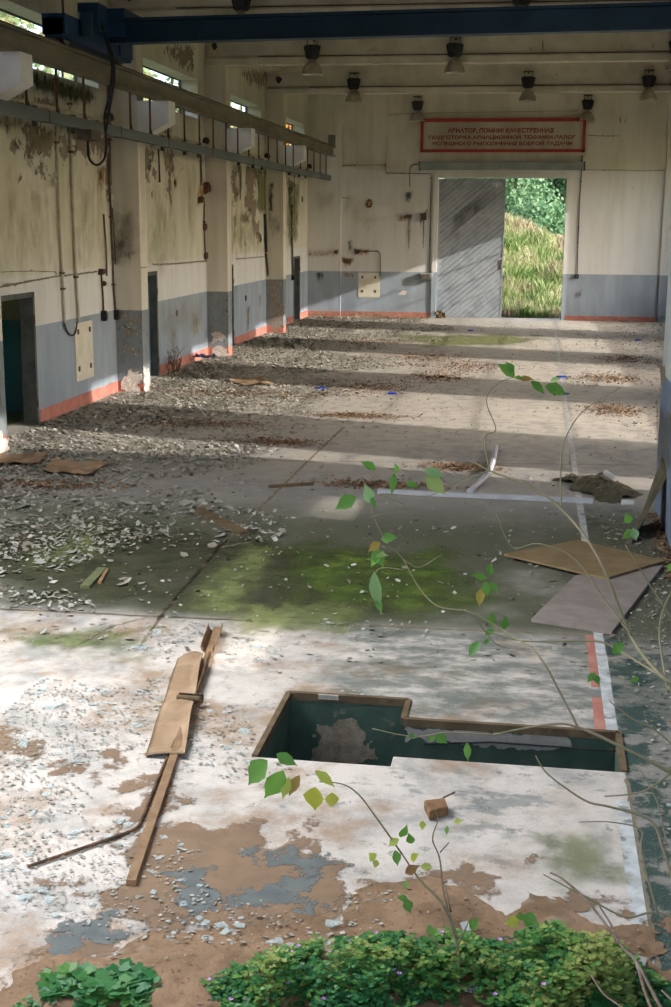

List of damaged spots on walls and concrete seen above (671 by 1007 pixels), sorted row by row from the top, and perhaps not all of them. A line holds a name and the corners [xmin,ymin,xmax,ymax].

flaking render [267,280,285,331]
flaking render [211,331,229,356]
flaking render [120,367,151,392]